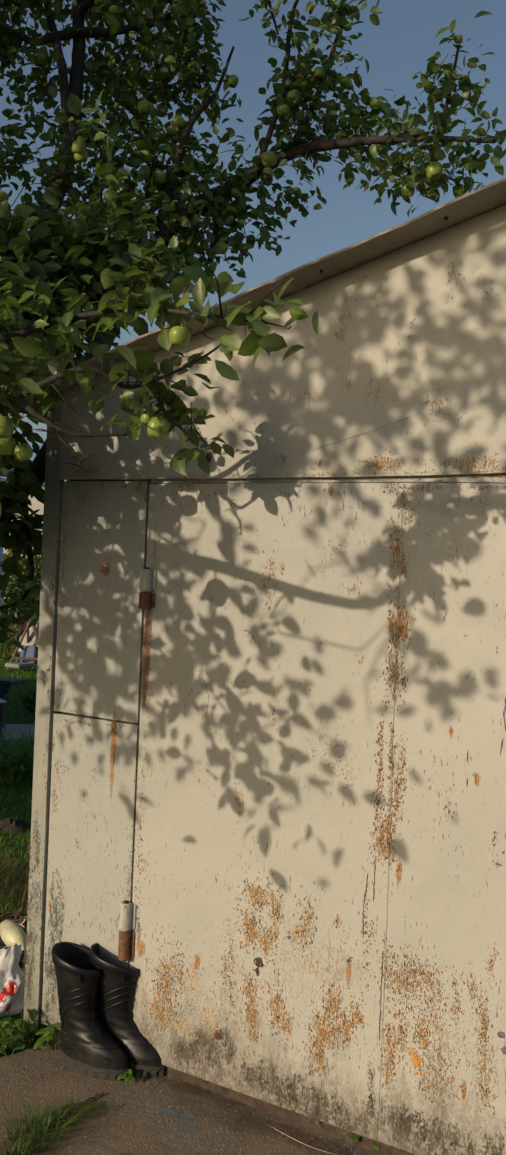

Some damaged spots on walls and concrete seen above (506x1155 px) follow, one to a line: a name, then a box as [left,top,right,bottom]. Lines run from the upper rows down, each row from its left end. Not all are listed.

corrosion [42,502,129,819]
corrosion [142,609,152,718]
corrosion [210,450,506,1142]
damp [169,1025,505,1155]